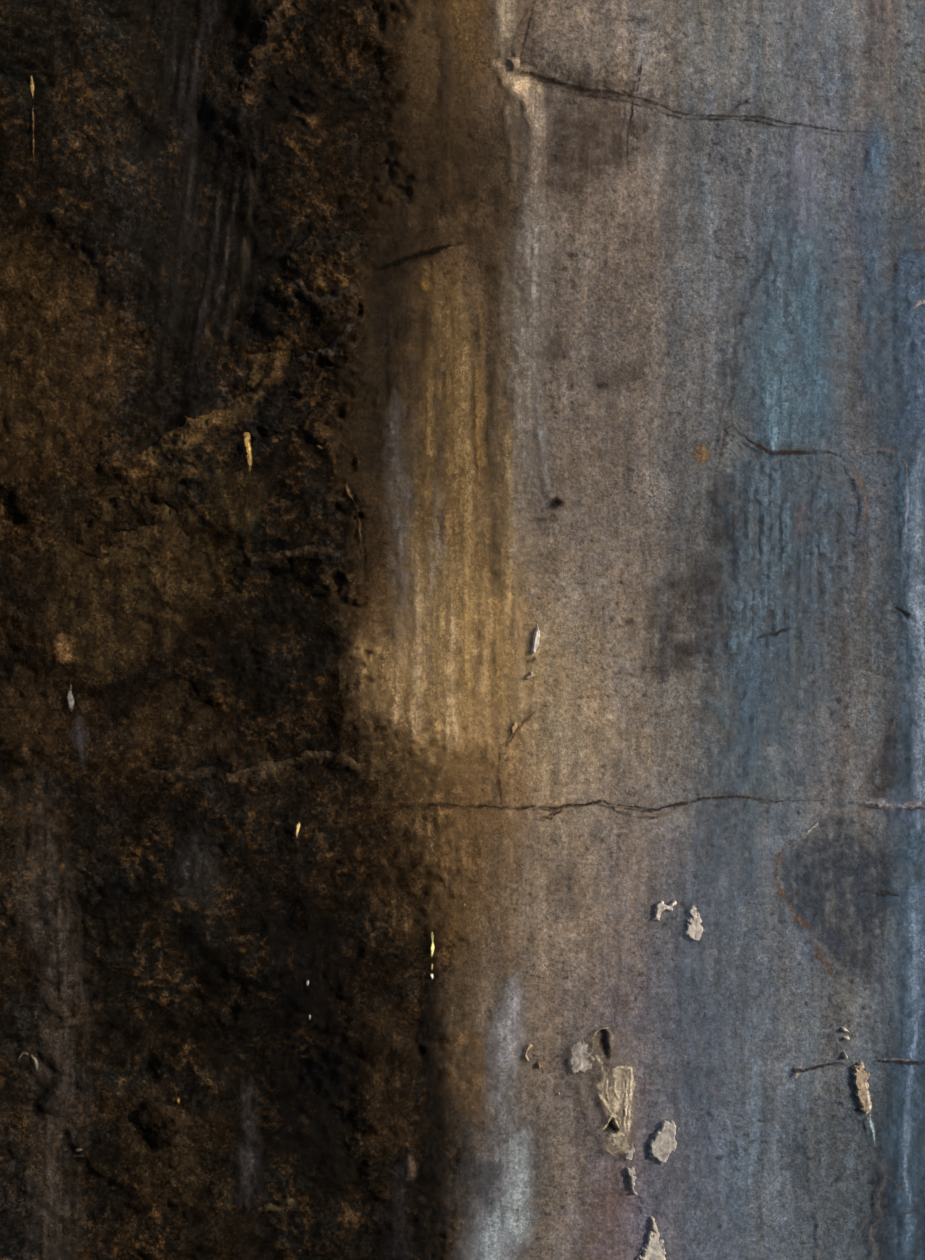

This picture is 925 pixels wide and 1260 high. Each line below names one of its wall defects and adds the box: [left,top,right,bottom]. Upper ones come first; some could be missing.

crack [520,63,866,155]
leakage [0,0,503,1260]
leakage [658,122,843,908]
crack [721,358,908,515]
leakage [885,253,925,867]
crack [376,711,802,820]
peeling [653,900,706,941]
leakage [480,1114,529,1260]
peeling [566,1027,677,1195]
peeling [637,1216,666,1260]
crack [793,1062,843,1072]
leakage [876,882,925,1260]